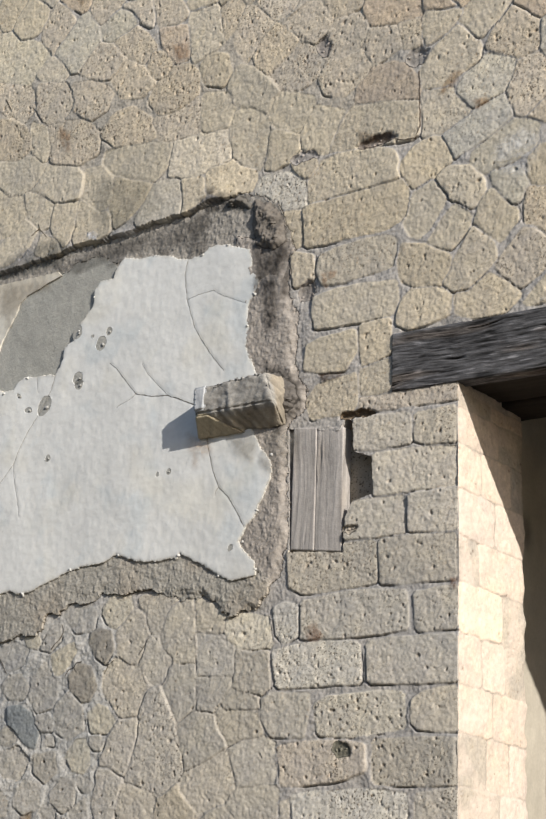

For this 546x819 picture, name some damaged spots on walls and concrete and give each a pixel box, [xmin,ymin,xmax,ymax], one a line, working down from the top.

spalling [358,132,396,150]
crack [185,262,239,370]
crack [110,363,194,408]
peeling [0,193,316,643]